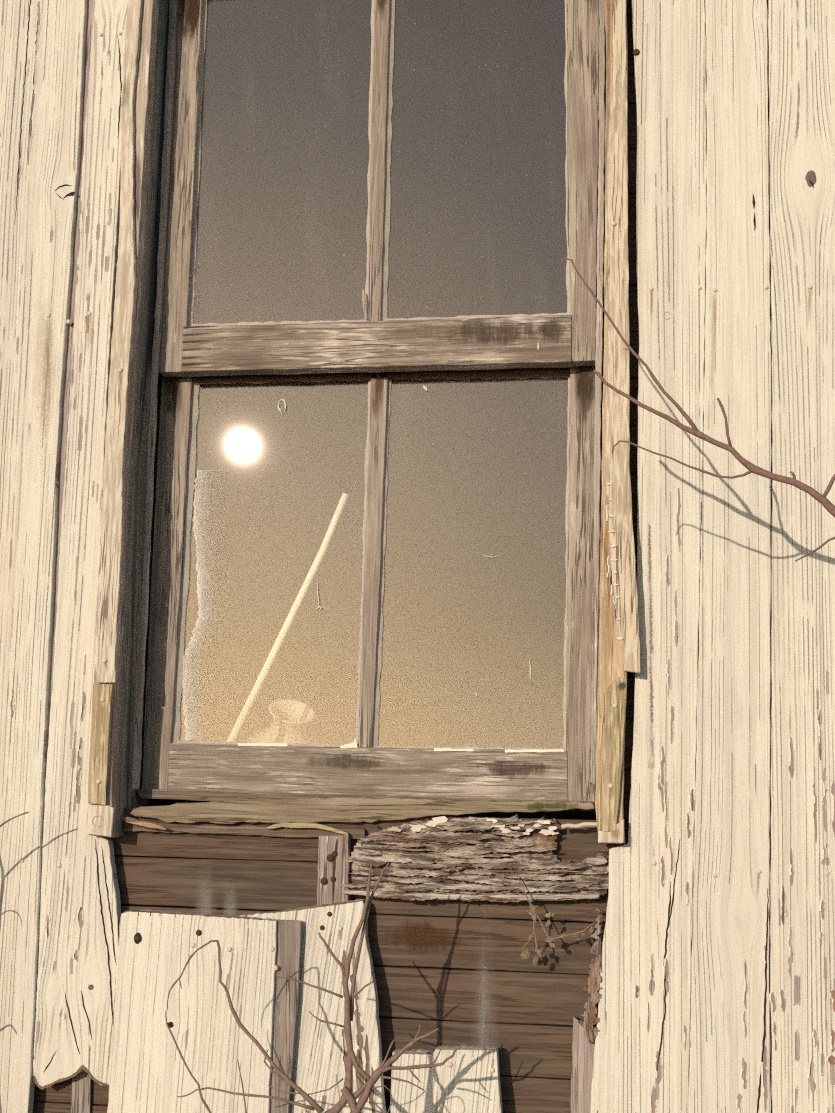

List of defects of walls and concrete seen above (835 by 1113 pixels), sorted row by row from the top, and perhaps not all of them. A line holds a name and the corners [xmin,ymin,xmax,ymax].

peeling [665,488,682,647]
peeling [388,816,448,832]
peeling [473,818,559,835]
peeling [657,659,675,887]
peeling [686,789,695,838]
peeling [812,710,835,866]
peeling [634,954,670,1033]
peeling [736,848,795,1113]
peeling [650,1051,663,1113]
peeling [807,1029,835,1093]